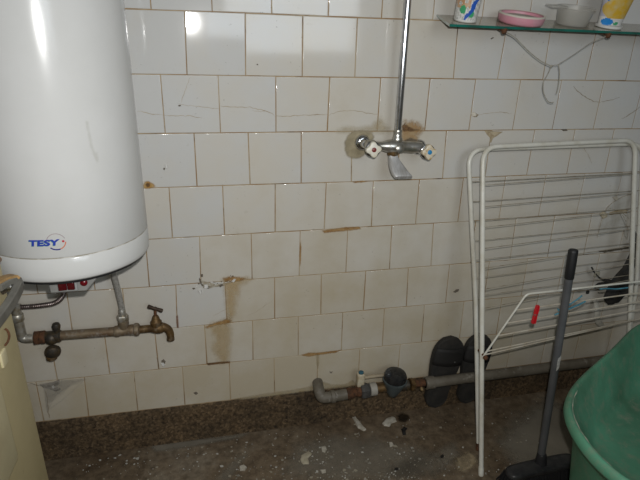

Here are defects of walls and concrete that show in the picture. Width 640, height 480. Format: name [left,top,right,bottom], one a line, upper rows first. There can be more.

crack [141,78,375,118]
damp [345,122,384,158]
spalling [192,274,236,294]